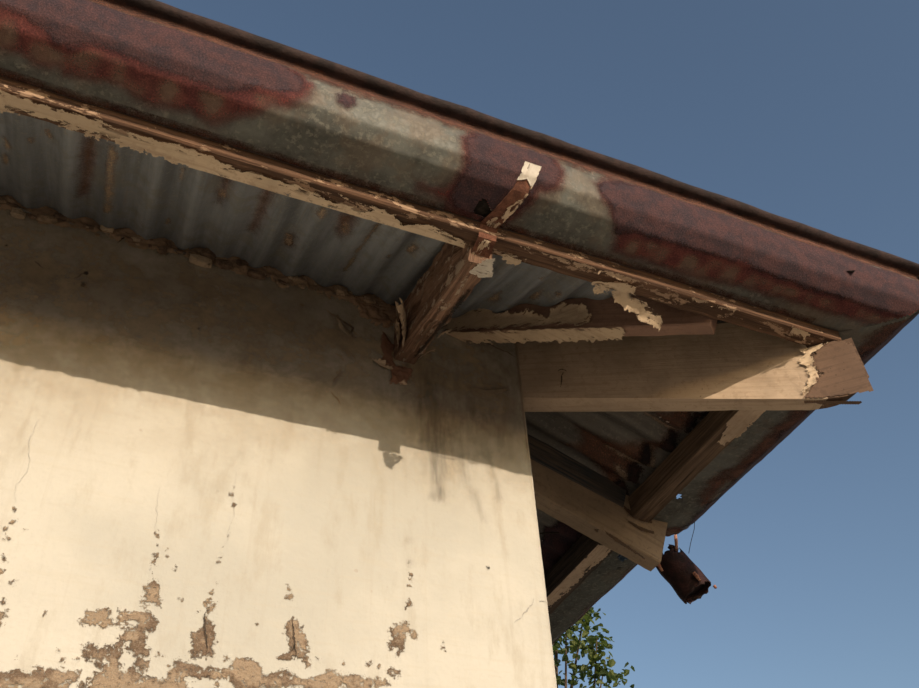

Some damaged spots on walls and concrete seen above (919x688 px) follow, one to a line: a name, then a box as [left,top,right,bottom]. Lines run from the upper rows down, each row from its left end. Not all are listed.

peeling [0,90,530,278]
rust [0,0,919,365]
peeling [487,161,542,228]
spalling [0,195,625,385]
peeling [542,252,663,331]
rust [567,411,710,496]
rust [665,410,815,536]
spalling [0,529,401,688]
spalling [388,621,418,656]
rust [540,520,583,577]
peeling [547,529,645,612]